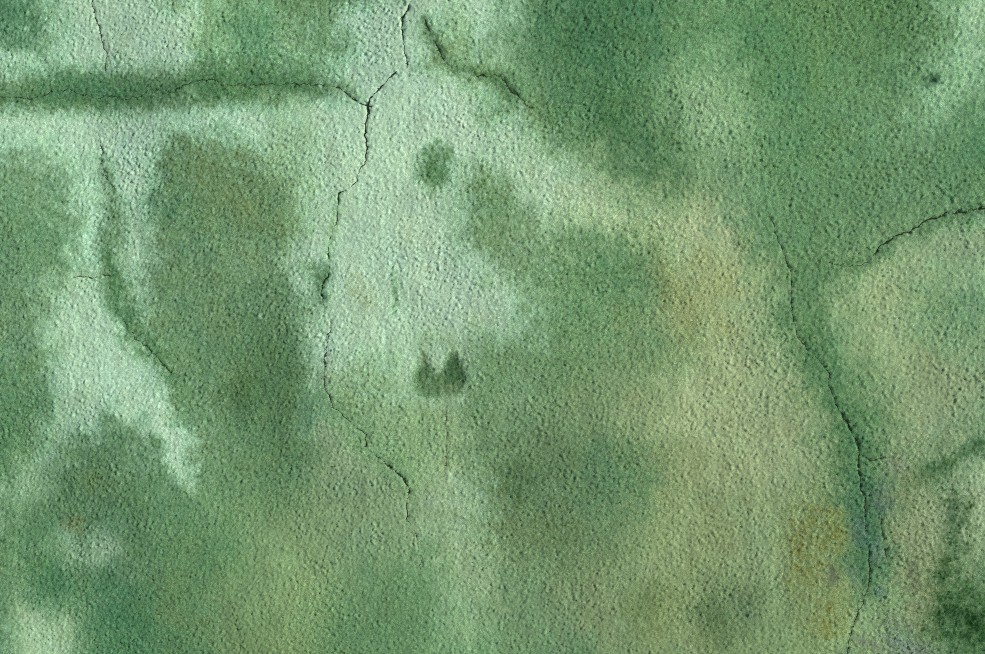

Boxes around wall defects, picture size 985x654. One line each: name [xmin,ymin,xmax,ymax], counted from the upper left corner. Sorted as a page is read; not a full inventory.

crack [5,0,446,570]
crack [476,74,540,111]
crack [766,207,891,654]
crack [828,206,985,267]